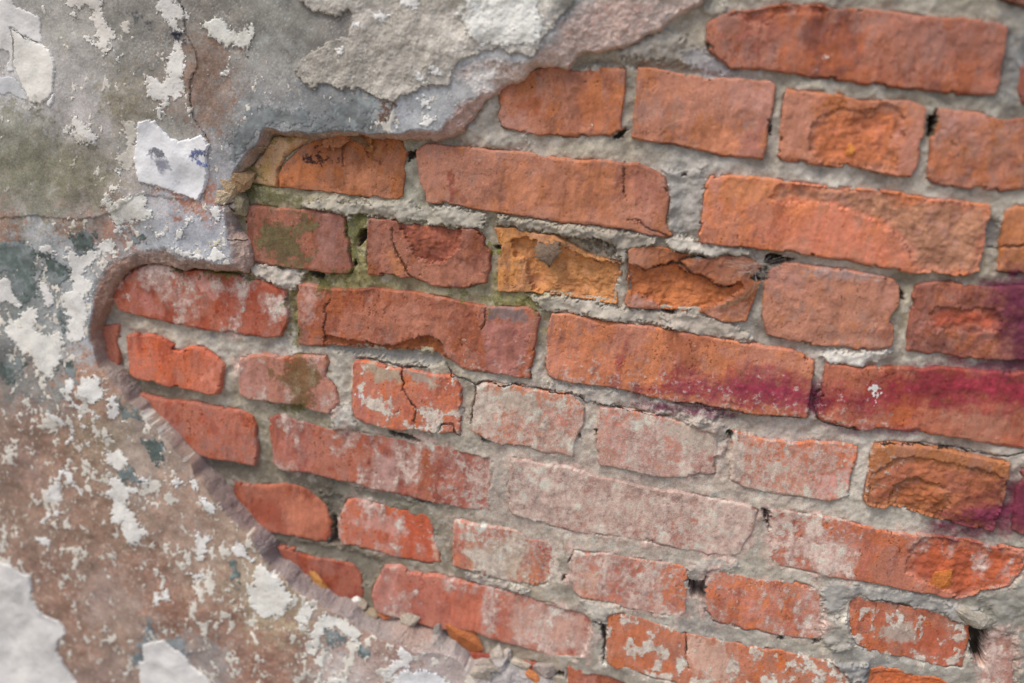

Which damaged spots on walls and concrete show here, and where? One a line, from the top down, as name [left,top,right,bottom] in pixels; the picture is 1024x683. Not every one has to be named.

spalling [808,103,906,173]
spalling [769,182,990,275]
water stain [134,258,196,323]
water stain [210,273,255,341]
water stain [264,294,294,322]
peeling [0,0,705,683]
spalling [511,236,744,311]
crack [640,255,736,288]
crack [359,358,858,435]
spalling [865,456,1005,528]
spalling [905,534,1024,599]
spalling [871,670,943,683]